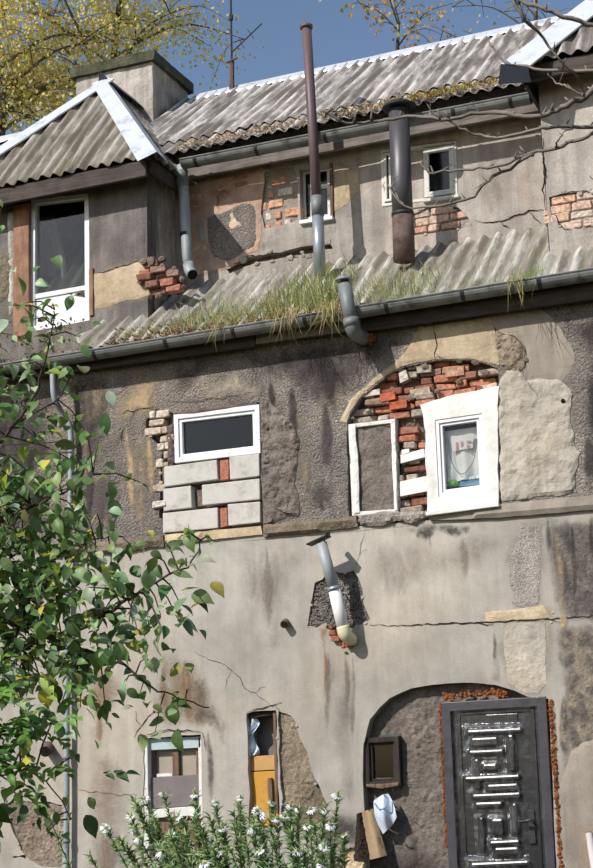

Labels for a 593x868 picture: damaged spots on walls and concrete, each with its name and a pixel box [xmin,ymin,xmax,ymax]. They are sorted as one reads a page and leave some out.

peeling [181,165,313,276]
flaking render [414,207,472,236]
flaking render [544,188,593,230]
peeling [93,256,188,310]
flaking render [335,317,528,519]
leakage [546,523,593,626]
flaking render [306,571,370,653]
crack [373,615,593,626]
crack [195,652,282,720]
flaking render [276,712,326,833]
flaking render [7,799,63,868]